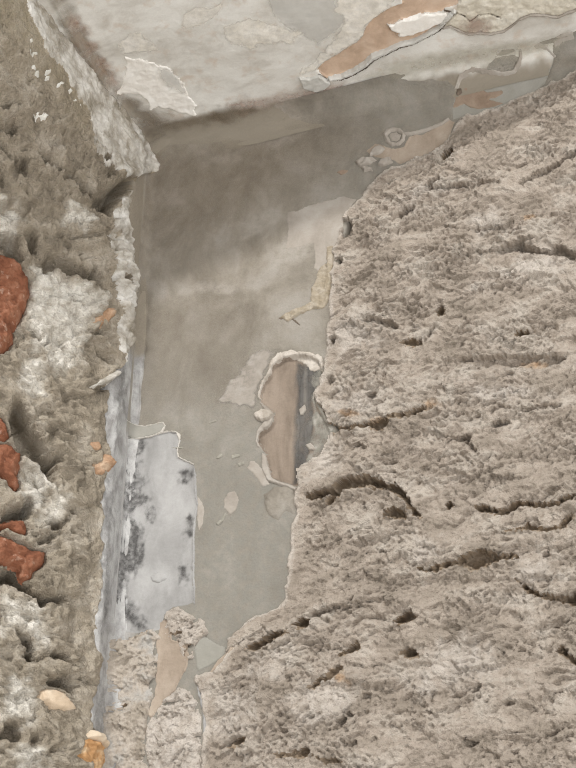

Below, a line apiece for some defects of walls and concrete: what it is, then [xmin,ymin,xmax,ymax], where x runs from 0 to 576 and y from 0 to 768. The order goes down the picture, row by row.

peeling [299,0,576,92]
flaking render [0,0,197,768]
flaking render [102,49,576,768]
leakage [127,441,147,509]
leakage [117,521,144,593]